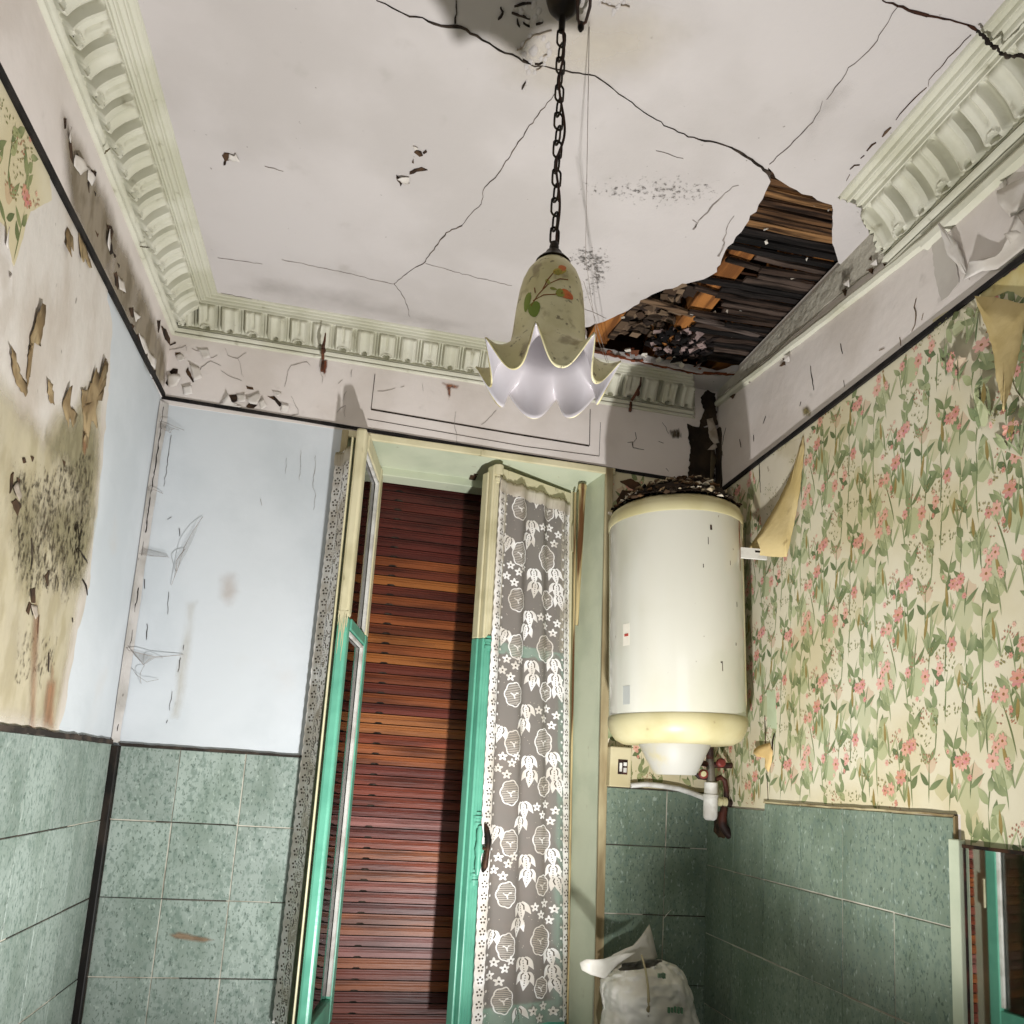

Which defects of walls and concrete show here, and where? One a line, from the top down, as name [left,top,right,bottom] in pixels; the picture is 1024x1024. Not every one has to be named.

peeling [64,118,97,196]
peeling [396,146,427,186]
crack [220,0,1024,317]
peeling [96,225,126,293]
peeling [932,177,1024,301]
peeling [619,282,699,346]
peeling [219,386,289,412]
spalling [687,390,723,488]
spalling [9,472,23,515]
crack [141,407,164,556]
spalling [26,570,50,619]
water stain [0,395,98,725]